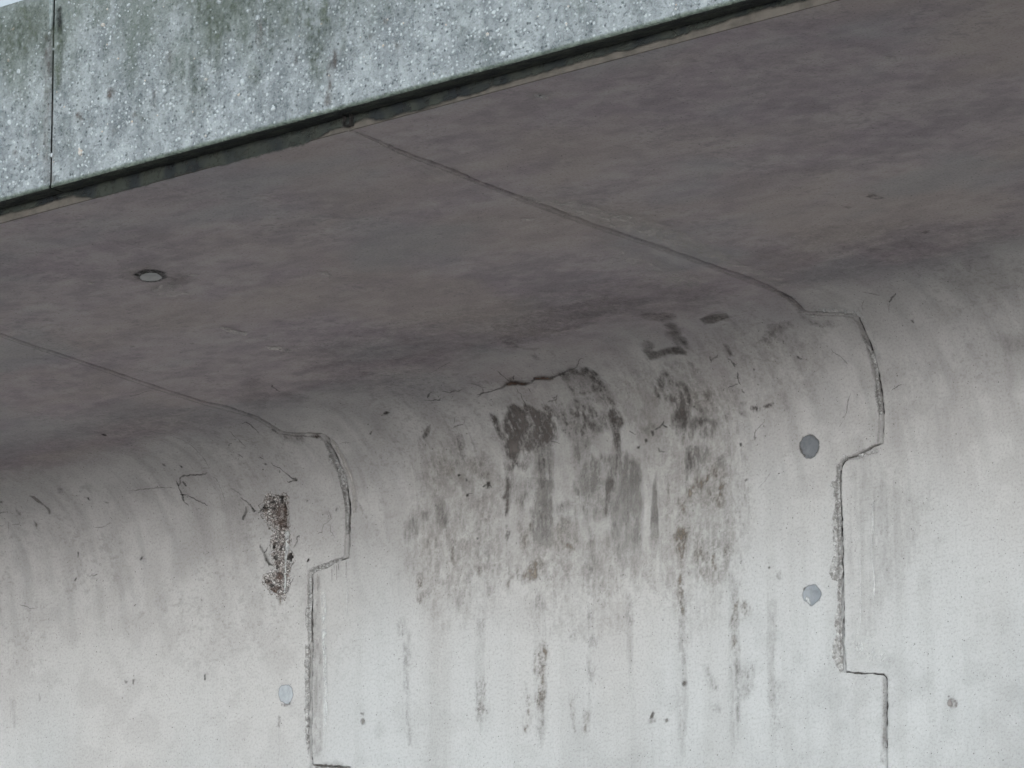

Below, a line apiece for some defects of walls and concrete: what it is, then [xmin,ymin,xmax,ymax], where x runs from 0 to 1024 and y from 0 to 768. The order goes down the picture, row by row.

crack [478,361,579,405]
damp [492,367,657,537]
damp [657,374,724,511]
spalling [258,491,300,603]